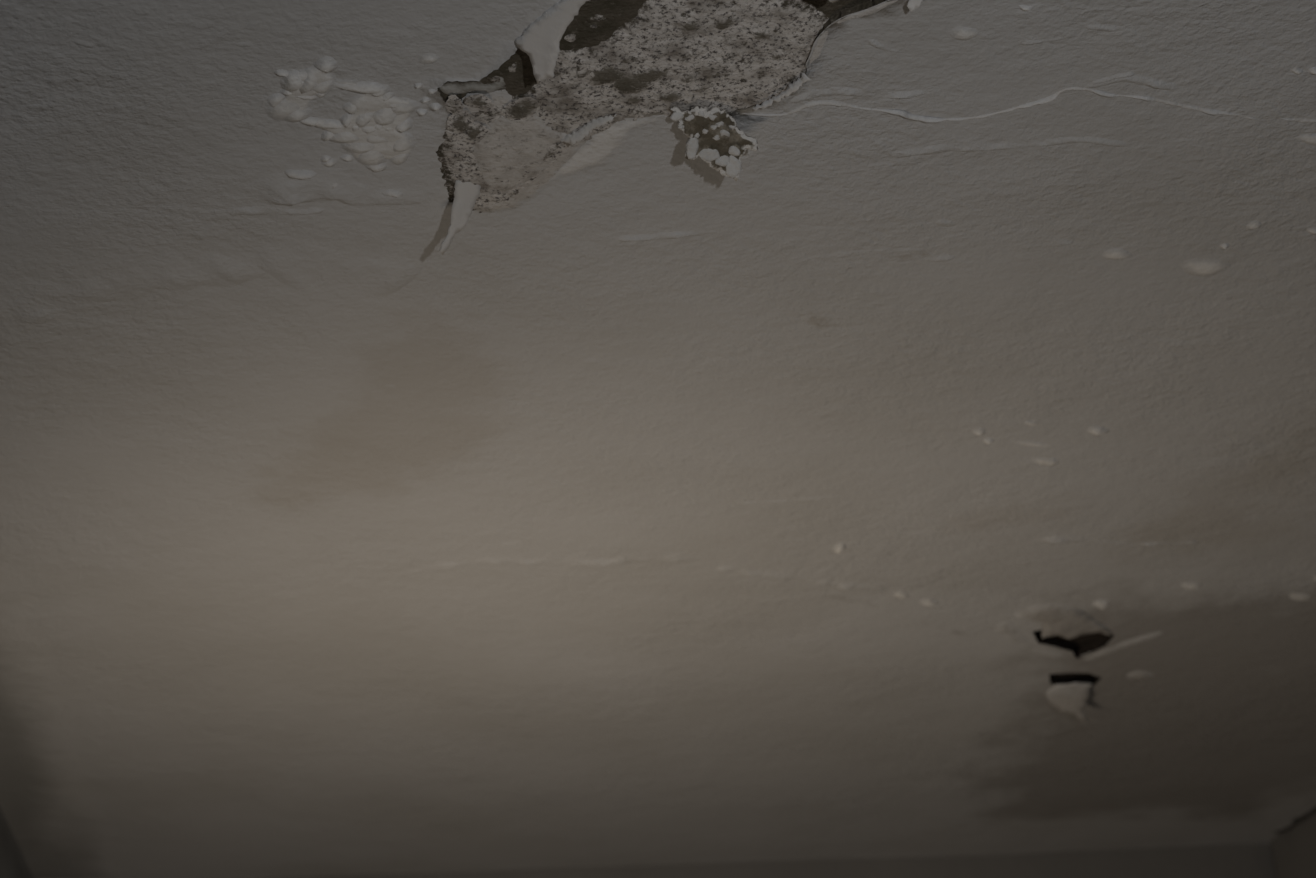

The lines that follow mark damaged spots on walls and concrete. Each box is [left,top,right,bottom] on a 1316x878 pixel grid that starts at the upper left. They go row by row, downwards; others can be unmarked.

peeling [436,0,925,255]
peeling [994,600,1164,726]